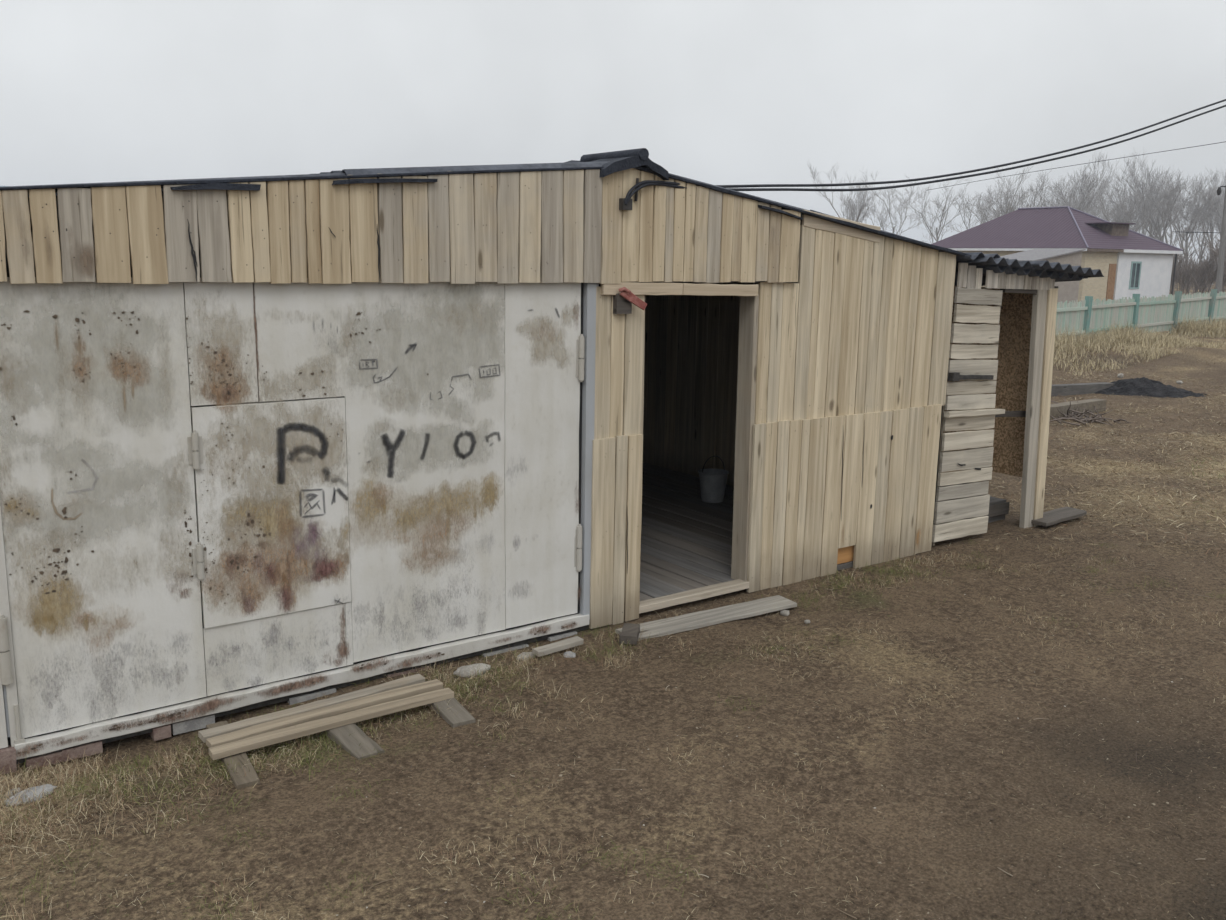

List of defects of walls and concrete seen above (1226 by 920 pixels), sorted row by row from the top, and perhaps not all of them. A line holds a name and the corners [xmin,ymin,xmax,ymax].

rust [355,476,498,567]
rust [203,519,345,611]
rust [32,579,109,640]
rust [336,615,444,672]
rust [258,675,327,696]
rust [103,698,234,731]
rust [16,736,85,756]